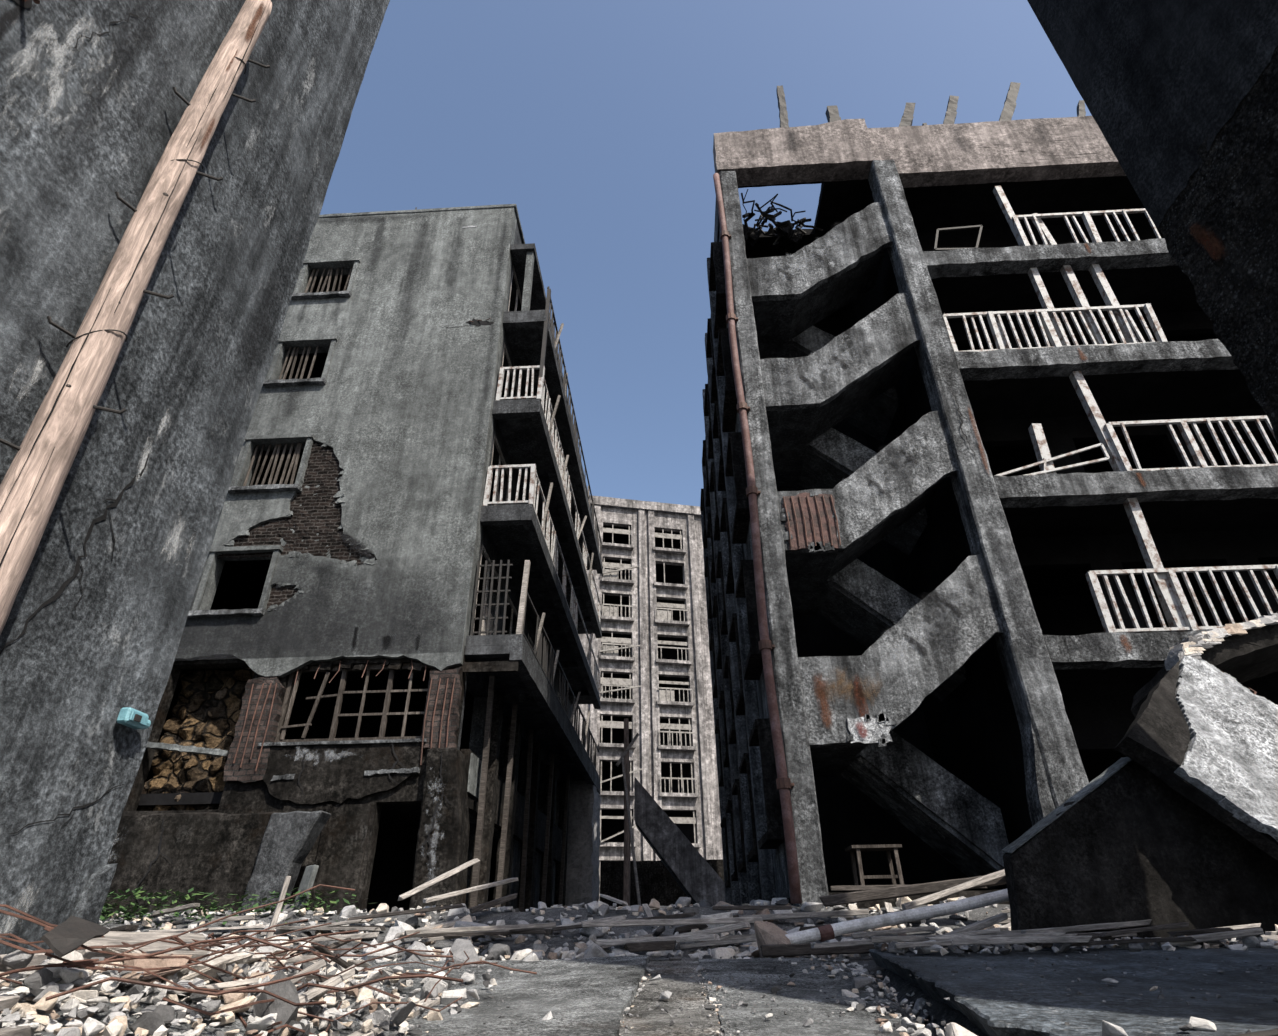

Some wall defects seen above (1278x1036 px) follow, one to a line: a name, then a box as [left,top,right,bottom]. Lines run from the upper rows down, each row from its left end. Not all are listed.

crack [0,451,150,654]
spalling [216,441,377,567]
spalling [847,713,898,747]